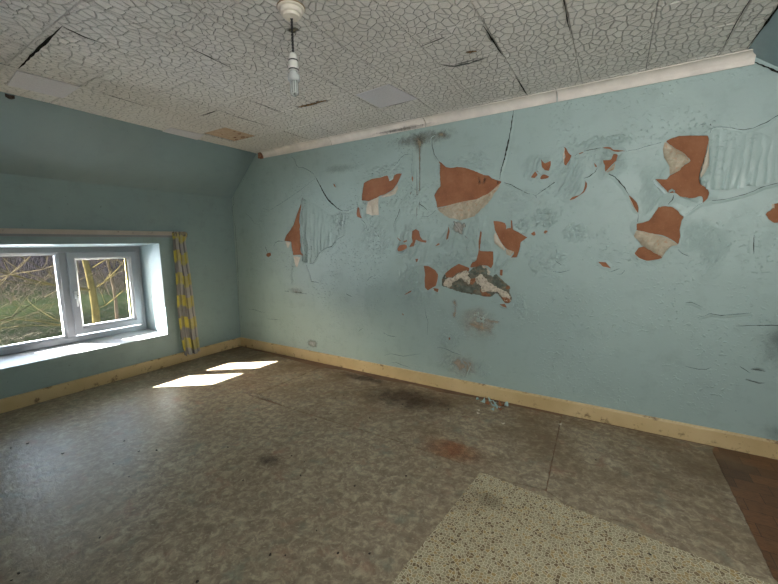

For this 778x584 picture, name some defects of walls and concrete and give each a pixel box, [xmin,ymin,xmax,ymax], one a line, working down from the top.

crack [0,26,103,68]
peeling [282,195,307,267]
peeling [355,169,415,220]
damp [382,124,444,191]
peeling [396,156,507,255]
spalling [404,216,549,309]
crack [499,110,558,199]
peeling [530,145,586,181]
peeling [592,144,626,172]
peeling [626,127,719,265]
peeling [759,198,778,228]